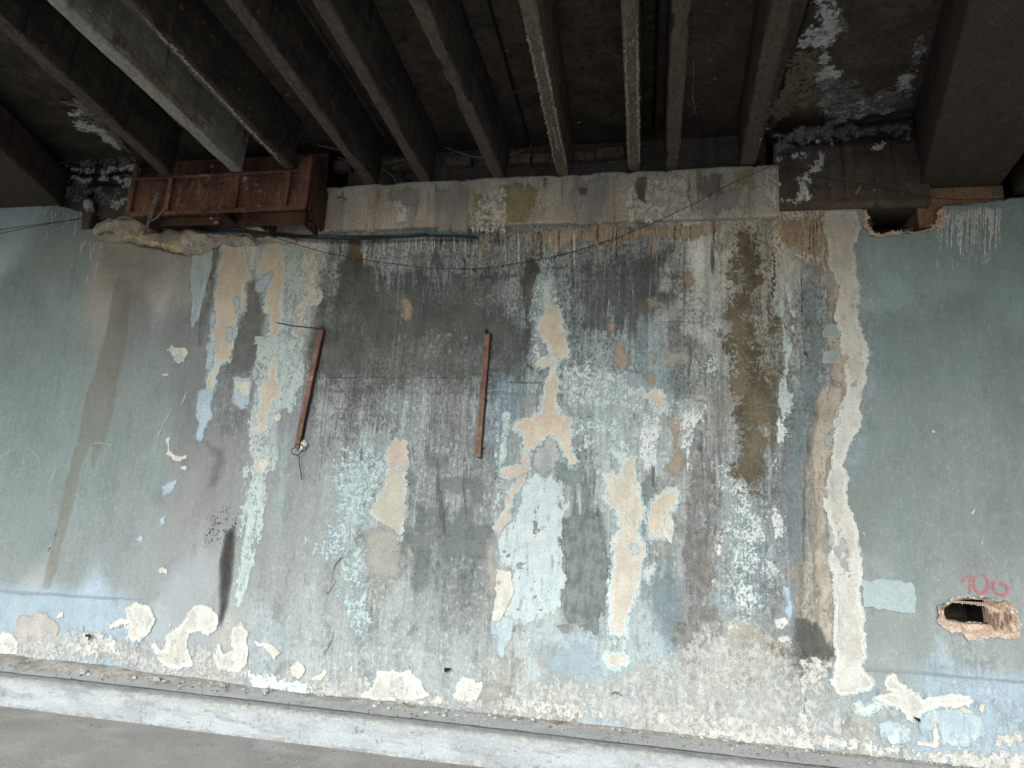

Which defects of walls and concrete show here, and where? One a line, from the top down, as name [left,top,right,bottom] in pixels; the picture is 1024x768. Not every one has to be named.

damp [34,98,140,283]
damp [322,178,546,369]
damp [571,0,931,226]
damp [937,205,1002,271]
peeling [0,218,324,673]
flaking render [304,437,410,641]
damp [0,227,847,743]
flaking render [360,209,1024,768]
flaking render [290,659,327,681]